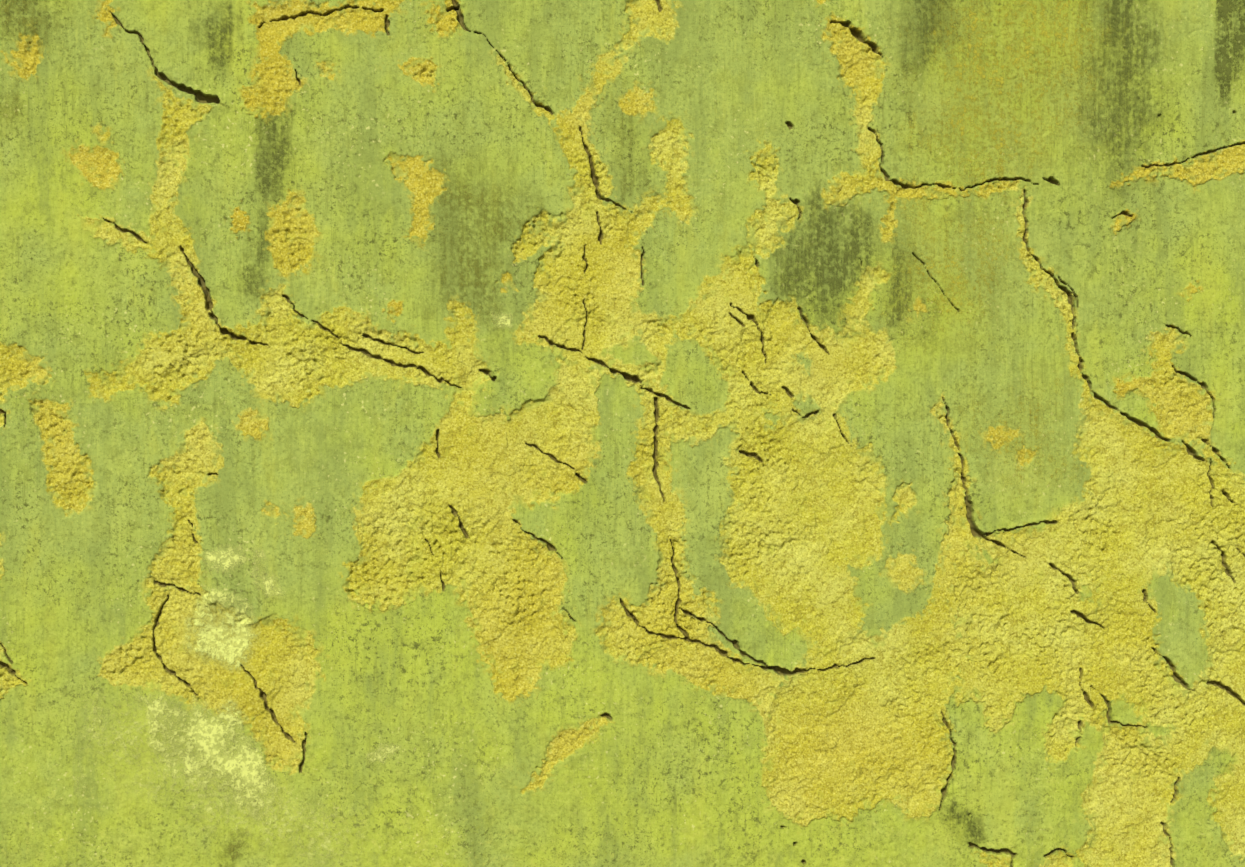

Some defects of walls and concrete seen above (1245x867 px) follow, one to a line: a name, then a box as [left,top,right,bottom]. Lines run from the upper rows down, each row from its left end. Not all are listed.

crack [111,12,221,105]
leakage [1215,0,1245,101]
spalling [0,641,29,700]
spalling [0,342,98,518]
spalling [98,420,327,776]
crack [283,295,498,389]
spalling [78,0,785,718]
crack [446,0,691,503]
crack [620,540,876,677]
spalling [660,15,1245,867]
crack [942,398,1105,630]
crack [868,128,1245,508]